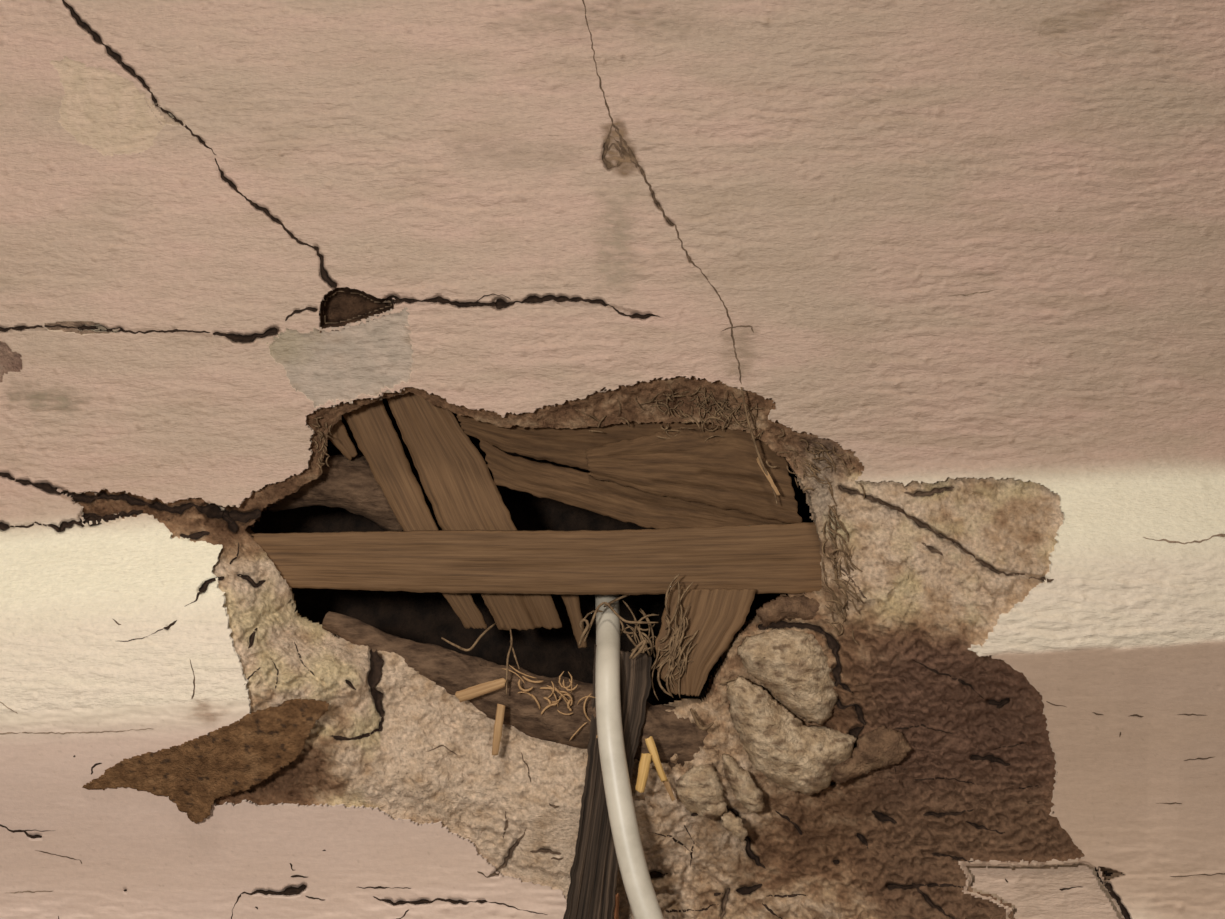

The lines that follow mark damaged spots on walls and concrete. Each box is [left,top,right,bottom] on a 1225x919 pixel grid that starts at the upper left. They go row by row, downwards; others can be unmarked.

crack [0,0,336,343]
crack [582,0,754,384]
peeling [0,341,22,382]
peeling [266,287,442,530]
crack [386,294,660,319]
spalling [452,412,655,531]
crack [838,485,1054,582]
spalling [65,489,596,908]
spalling [619,468,1123,919]
crack [231,863,324,919]
crack [359,811,564,919]
spalling [613,865,634,919]